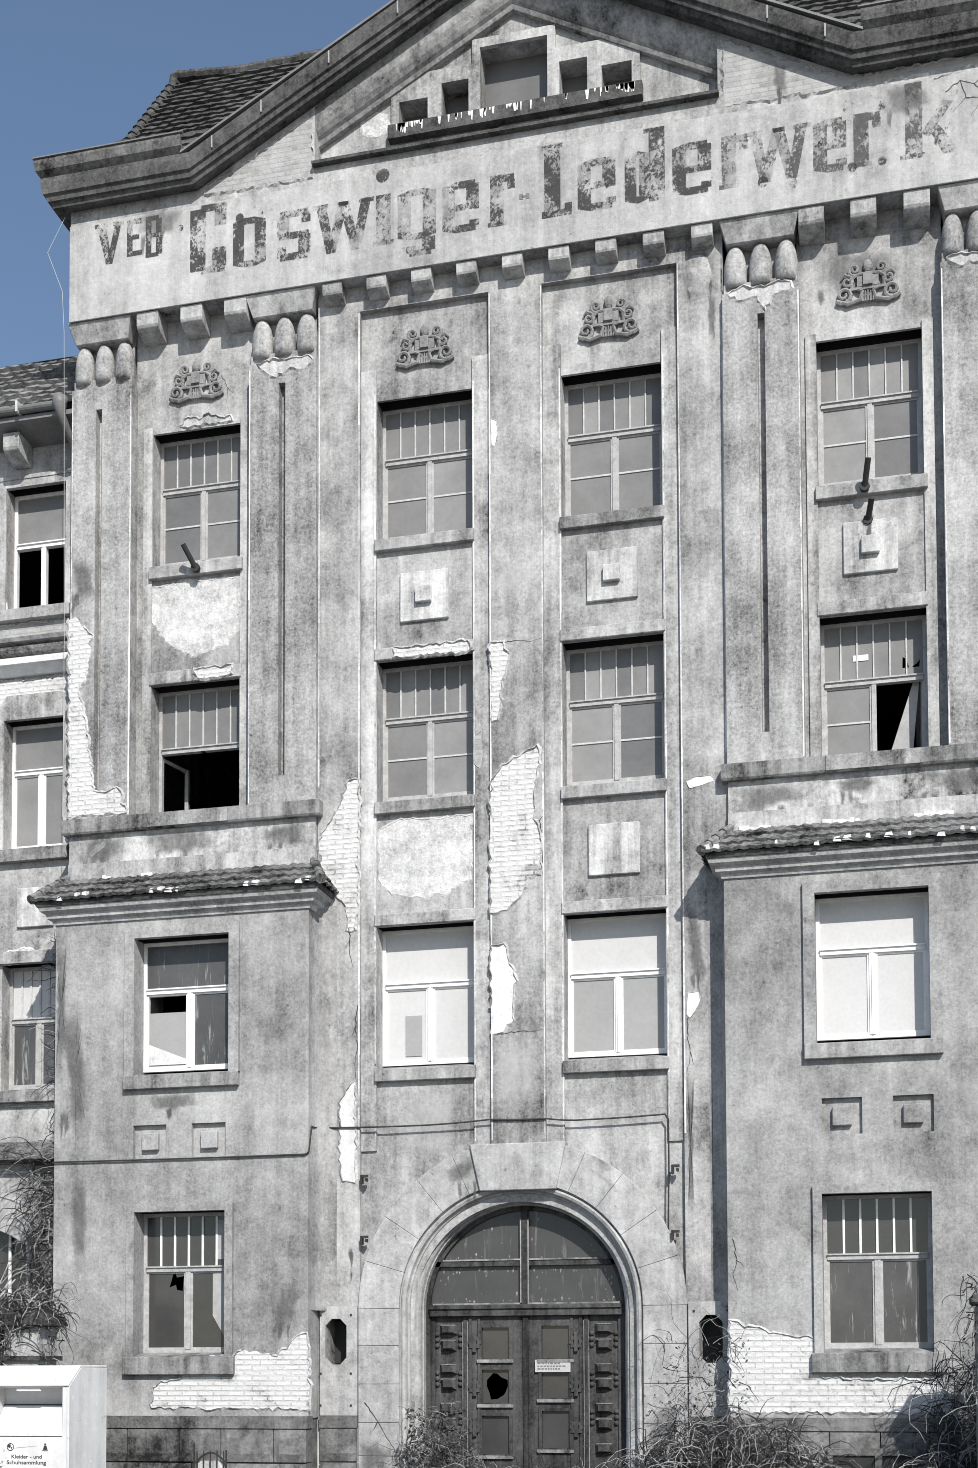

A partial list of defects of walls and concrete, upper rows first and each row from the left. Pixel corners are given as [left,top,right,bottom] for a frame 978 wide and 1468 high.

crack [934,69,978,116]
peeling [0,602,129,820]
peeling [317,638,544,933]
peeling [488,941,519,1035]
peeling [336,1079,359,1184]
peeling [149,1332,314,1413]
peeling [727,1319,954,1417]